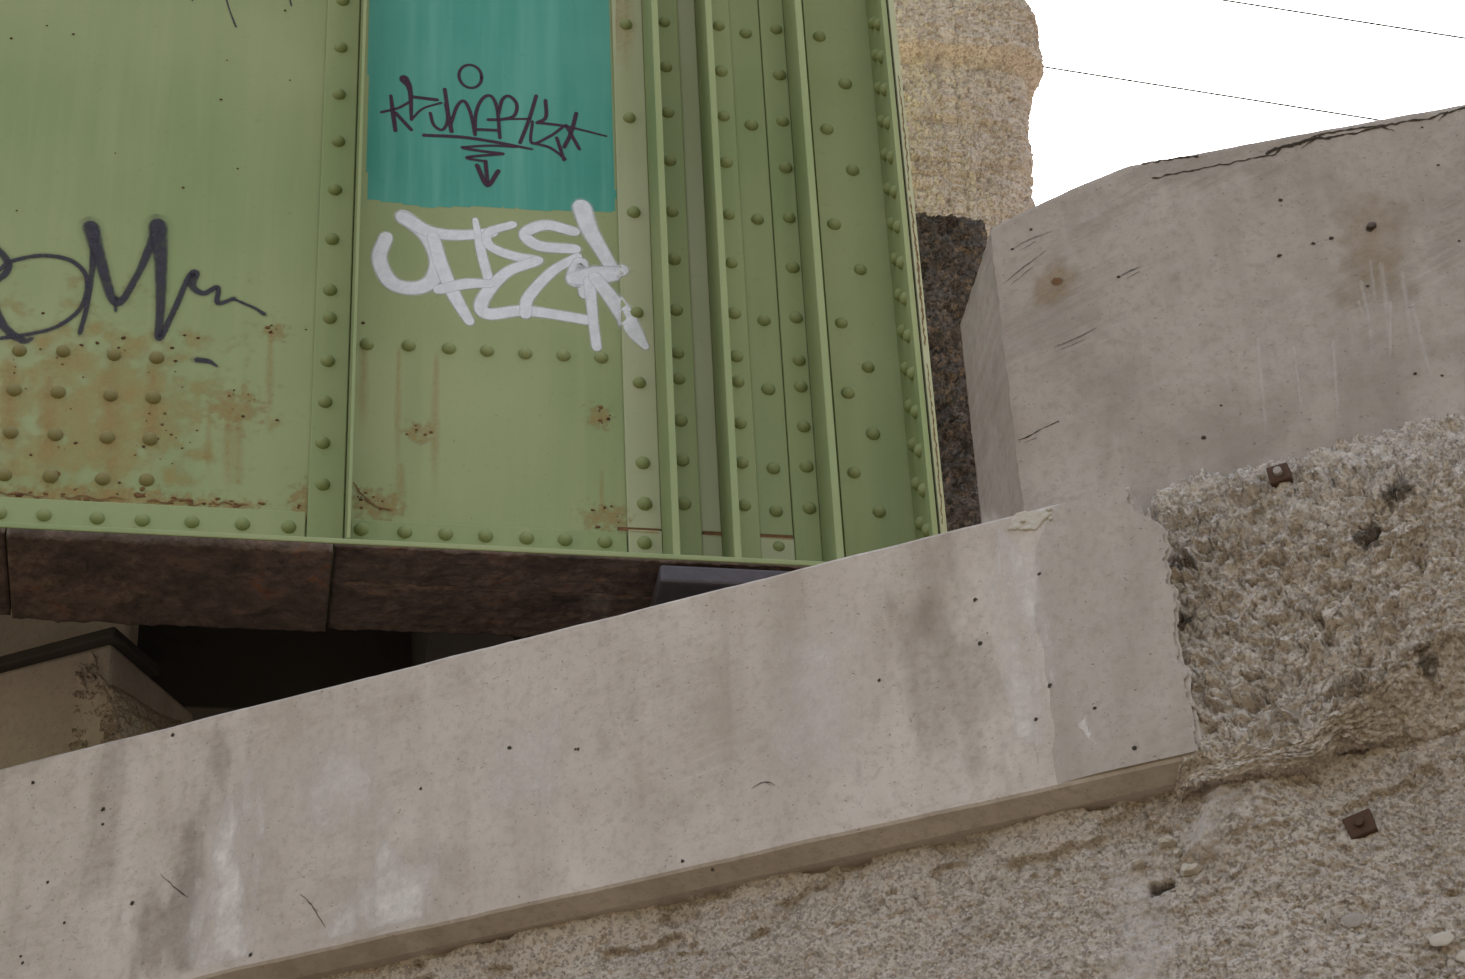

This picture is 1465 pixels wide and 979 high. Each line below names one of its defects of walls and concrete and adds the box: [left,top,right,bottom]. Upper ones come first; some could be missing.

crack [1141,107,1465,179]
rust [0,446,266,508]